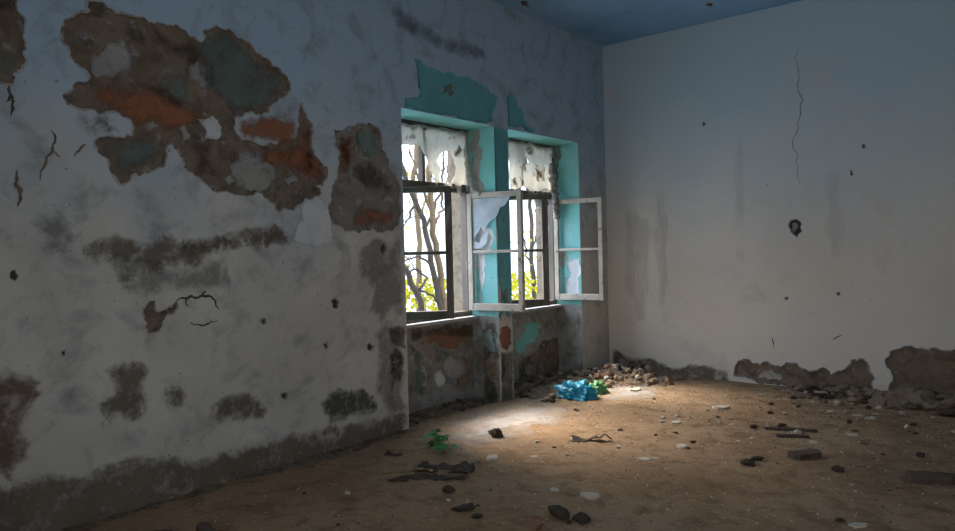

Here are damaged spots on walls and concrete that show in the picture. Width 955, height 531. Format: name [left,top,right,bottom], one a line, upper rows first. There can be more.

flaking render [0,0,28,87]
flaking render [60,0,402,254]
crack [792,50,803,183]
peeling [404,58,559,383]
flaking render [788,219,802,238]
crack [175,290,219,326]
flaking render [389,323,474,407]
flaking render [733,358,875,389]
flaking render [885,345,955,395]